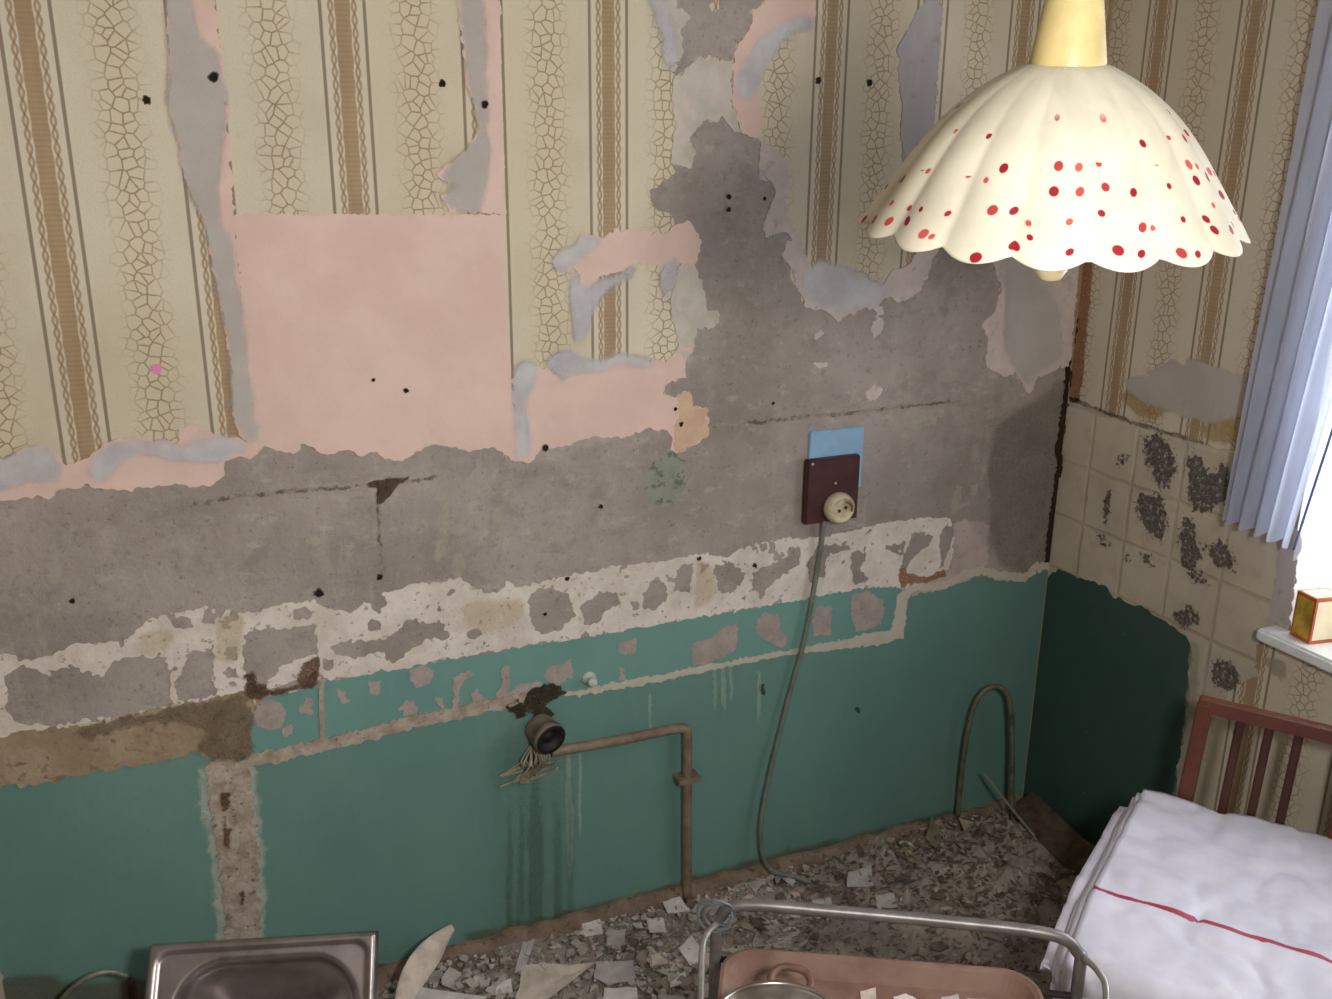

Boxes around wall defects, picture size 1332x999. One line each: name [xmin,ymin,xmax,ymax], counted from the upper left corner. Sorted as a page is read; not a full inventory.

spalling [671,0,764,76]
crack [185,474,437,572]
spalling [0,116,1287,942]
leakage [1096,485,1115,551]
leakage [1116,390,1240,587]
spalling [1291,527,1302,557]
flaking render [594,960,638,999]
spalling [860,987,876,999]